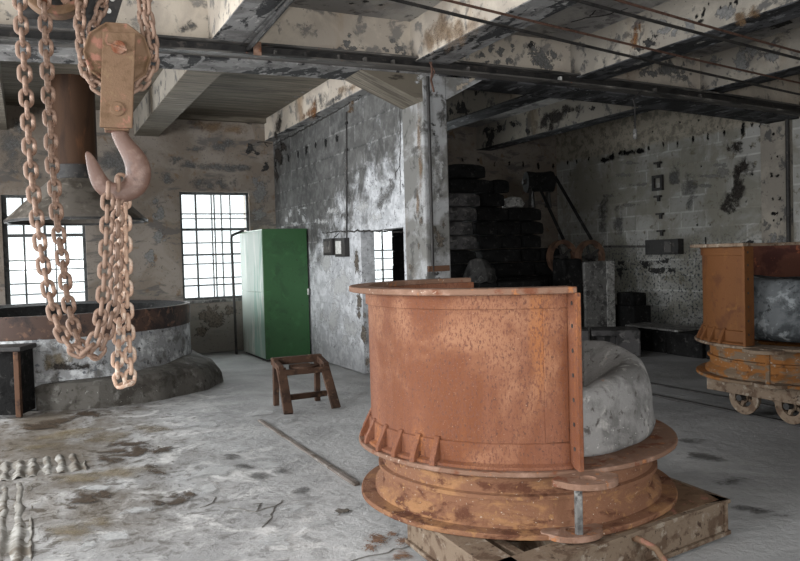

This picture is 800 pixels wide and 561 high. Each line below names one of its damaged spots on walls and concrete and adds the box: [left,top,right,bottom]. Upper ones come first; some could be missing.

peeling [463,25,515,65]
peeling [527,41,558,70]
peeling [634,18,695,81]
leakage [274,142,287,182]
leakage [377,179,394,210]
leakage [23,410,103,430]
leakage [97,439,171,474]
leakage [66,474,117,509]
crack [200,497,282,527]
leakage [53,518,130,547]